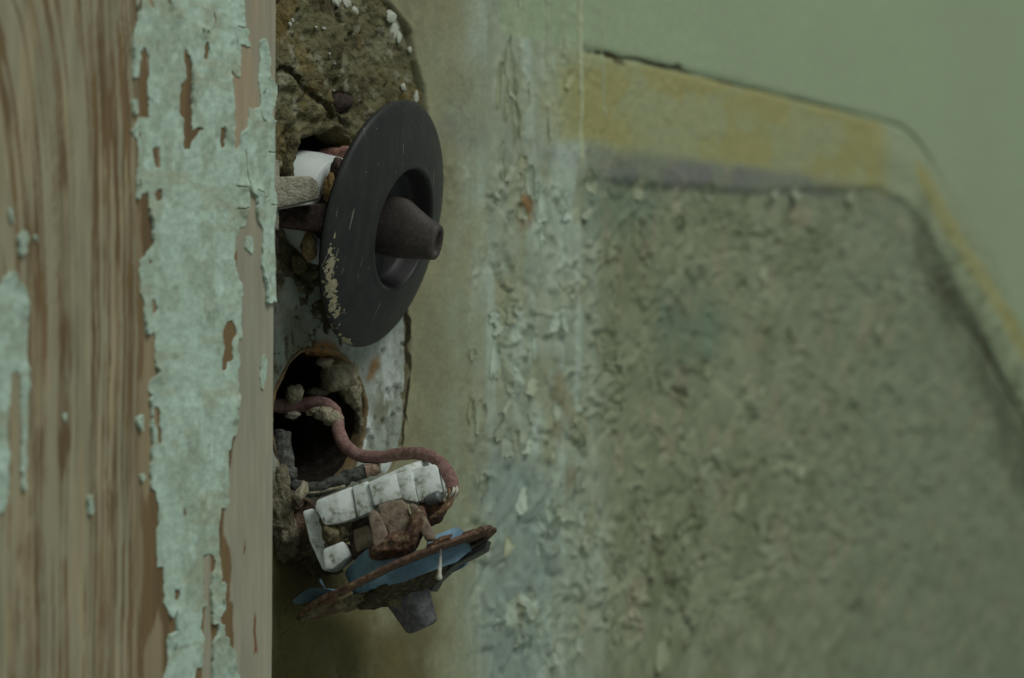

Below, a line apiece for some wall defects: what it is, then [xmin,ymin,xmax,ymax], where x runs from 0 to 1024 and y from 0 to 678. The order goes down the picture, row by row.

peeling [488,34,594,245]
peeling [0,270,31,513]
peeling [8,208,38,256]
peeling [131,0,422,678]
peeling [467,305,539,461]
peeling [548,285,578,333]
peeling [515,466,590,561]
peeling [494,585,563,669]